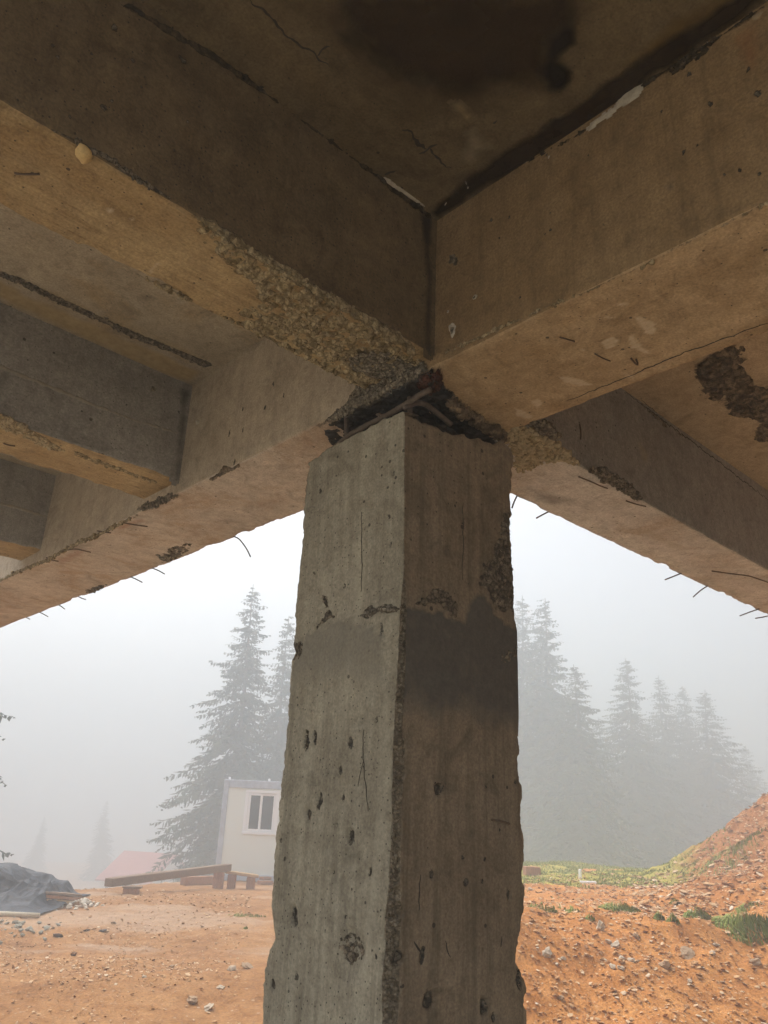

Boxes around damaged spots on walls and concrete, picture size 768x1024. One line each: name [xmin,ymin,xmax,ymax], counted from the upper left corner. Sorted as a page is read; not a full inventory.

crack [250,0,330,66]
leakage [233,0,760,361]
spalling [193,214,510,447]
spalling [529,419,562,441]
spalling [695,345,768,443]
spalling [0,451,178,582]
spalling [479,496,518,612]
spalling [360,550,458,879]